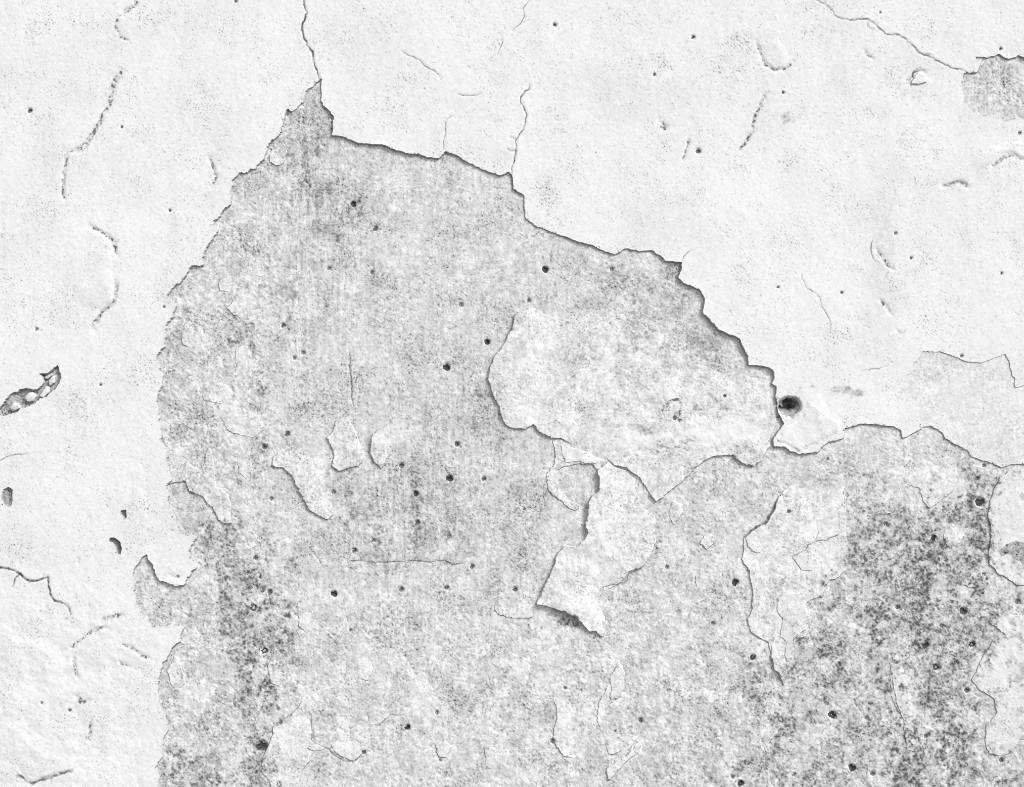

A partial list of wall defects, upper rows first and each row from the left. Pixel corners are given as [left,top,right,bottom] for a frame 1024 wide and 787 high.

crack [301,1,319,76]
crack [821,2,958,80]
crack [62,71,122,198]
flaking render [0,367,61,415]
flaking render [134,81,1024,787]
crack [0,567,70,610]
damp [797,467,1004,787]